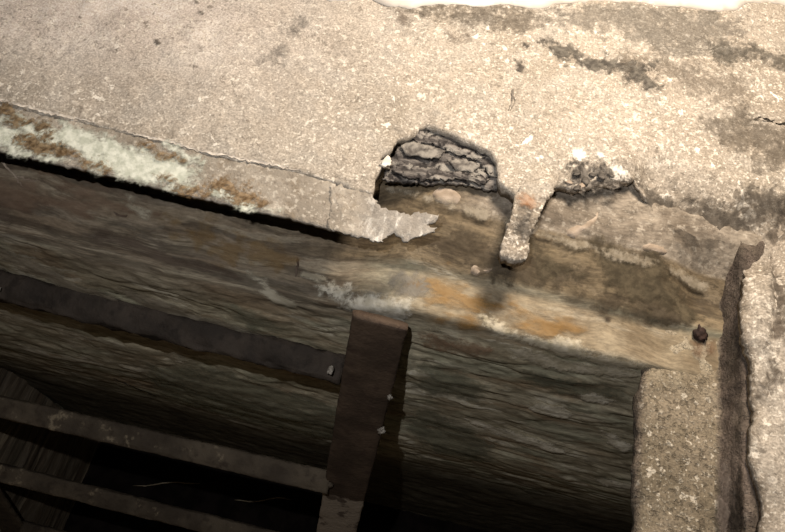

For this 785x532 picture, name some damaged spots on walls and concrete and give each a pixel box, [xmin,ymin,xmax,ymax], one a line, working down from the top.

damp [537,38,664,90]
damp [709,42,785,70]
damp [708,108,785,169]
spalling [562,148,630,195]
damp [247,271,296,308]